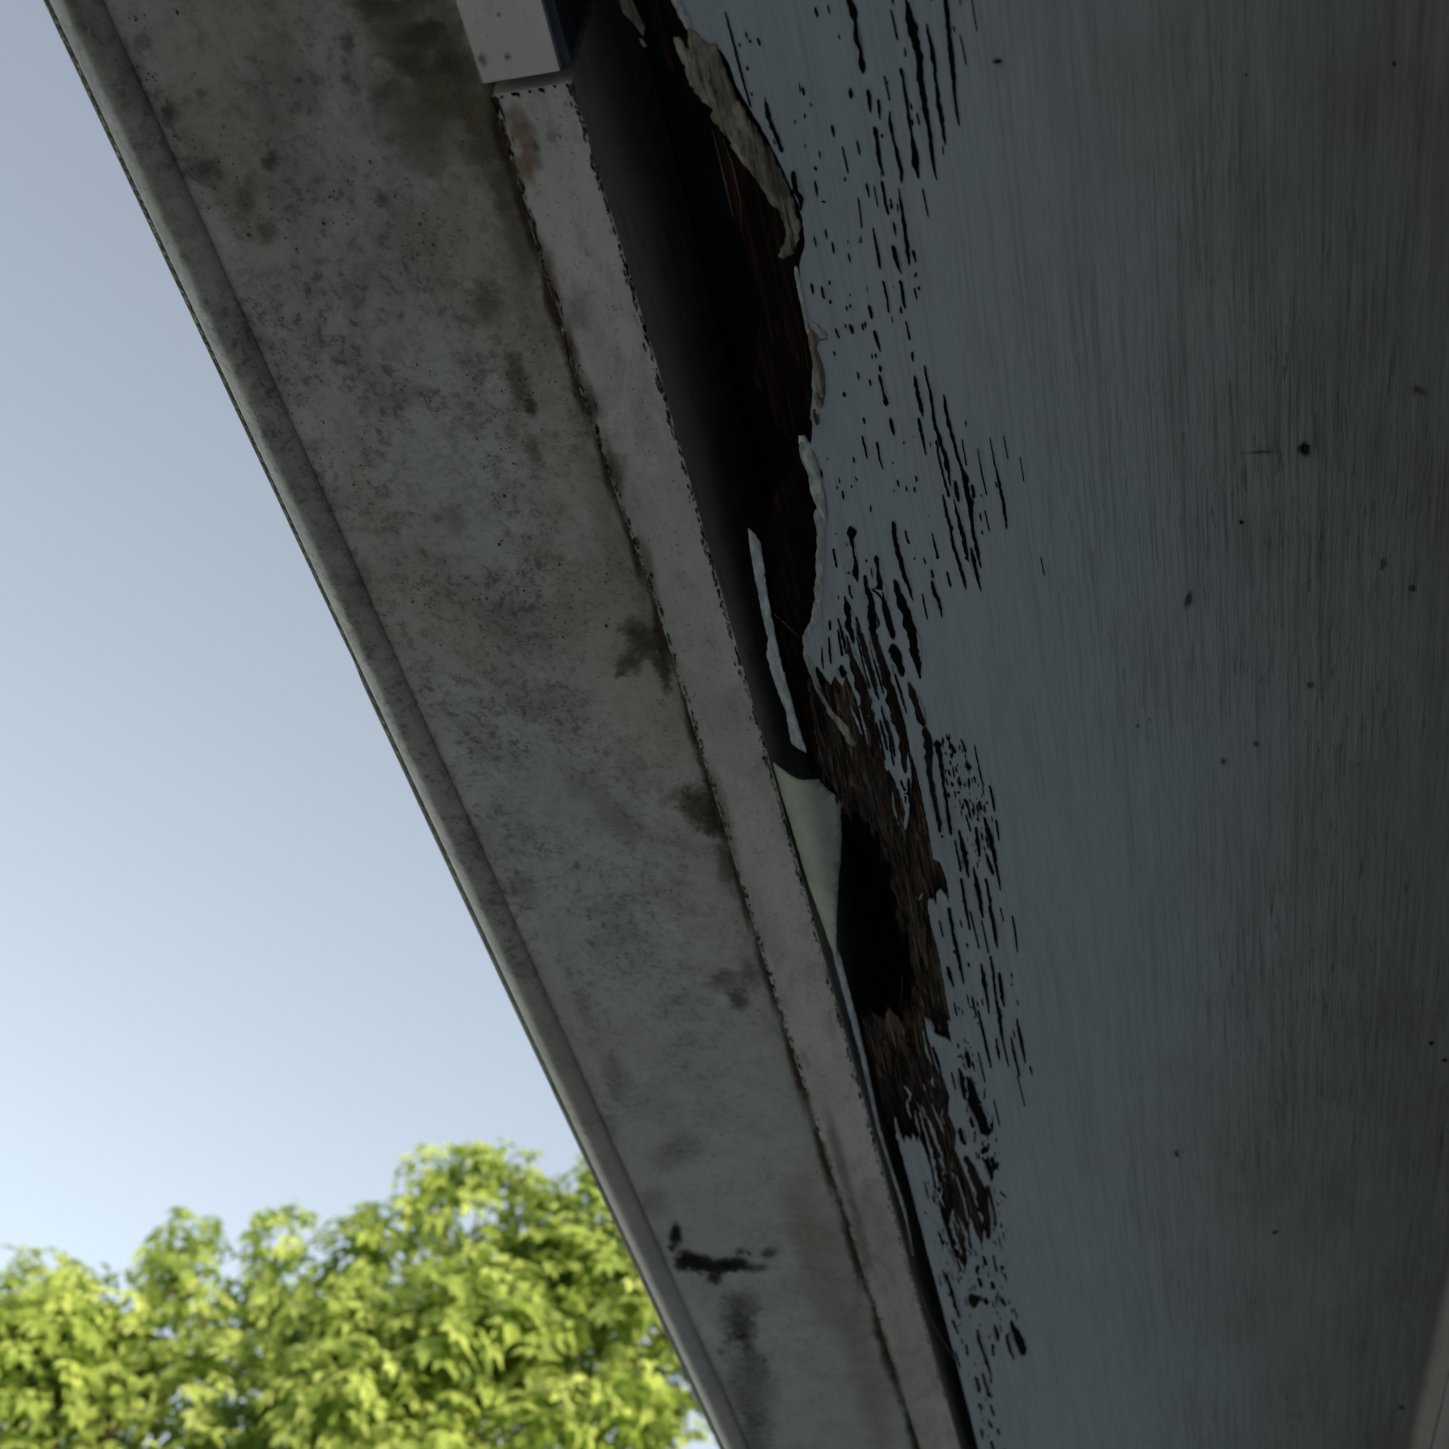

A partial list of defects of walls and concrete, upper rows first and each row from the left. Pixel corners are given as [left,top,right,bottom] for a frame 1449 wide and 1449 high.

leakage [373,1,537,187]
peeling [619,0,647,47]
peeling [725,12,784,153]
spalling [490,81,946,1405]
peeling [810,0,1033,1449]